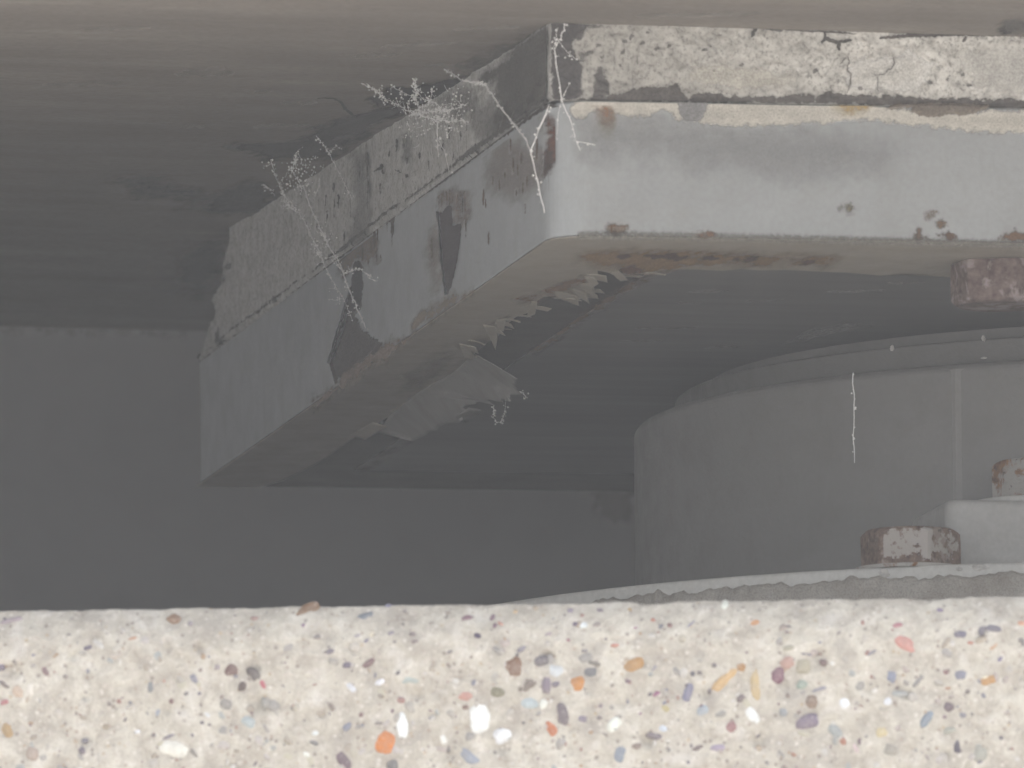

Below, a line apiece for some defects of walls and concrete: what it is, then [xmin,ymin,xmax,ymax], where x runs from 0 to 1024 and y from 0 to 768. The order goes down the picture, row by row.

crack [751,29,1015,93]
peeling [436,206,461,295]
rust [914,211,957,240]
peeling [197,236,1024,487]